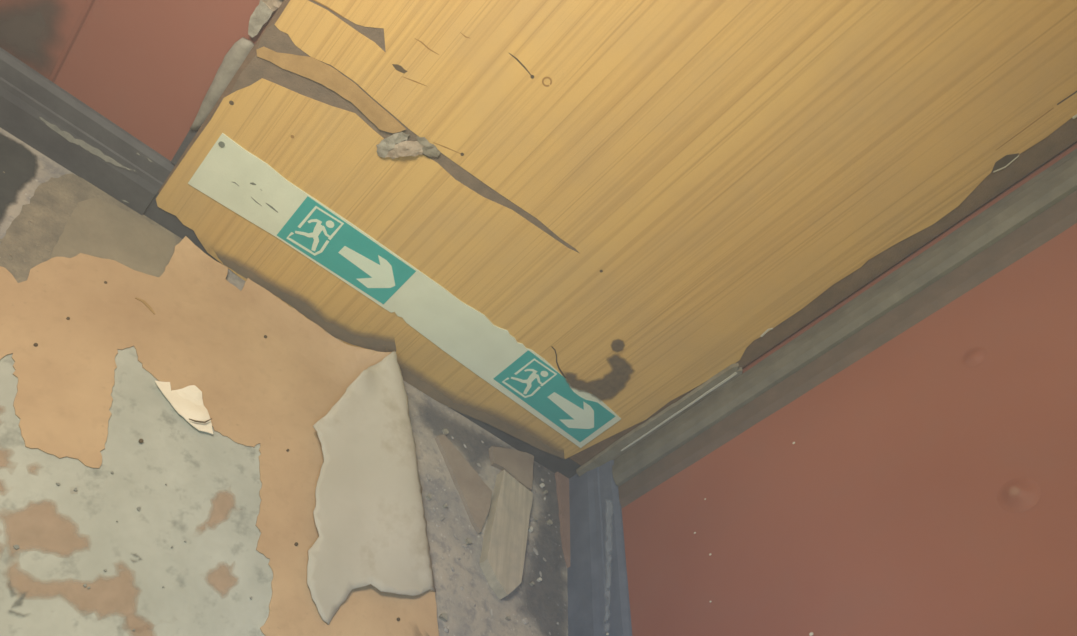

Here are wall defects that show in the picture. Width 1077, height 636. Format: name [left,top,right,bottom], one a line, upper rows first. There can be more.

spalling [257,22,310,57]
peeling [39,117,135,171]
peeling [0,346,273,636]